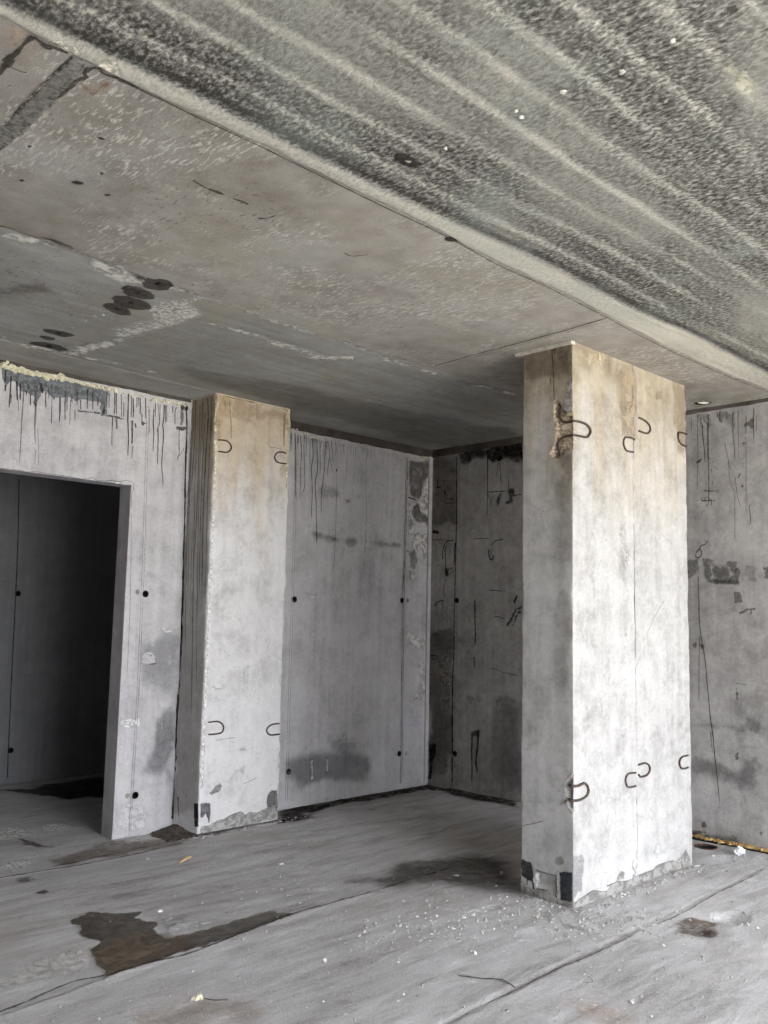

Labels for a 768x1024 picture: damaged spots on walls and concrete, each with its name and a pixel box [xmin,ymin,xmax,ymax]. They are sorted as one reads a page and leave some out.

water stain [0,226,73,249]
water stain [15,258,370,361]
water stain [2,368,212,480]
spalling [550,380,575,459]
water stain [290,428,430,538]
spalling [194,790,278,833]
water stain [277,730,518,823]
spalling [520,851,691,909]
water stain [71,911,294,975]